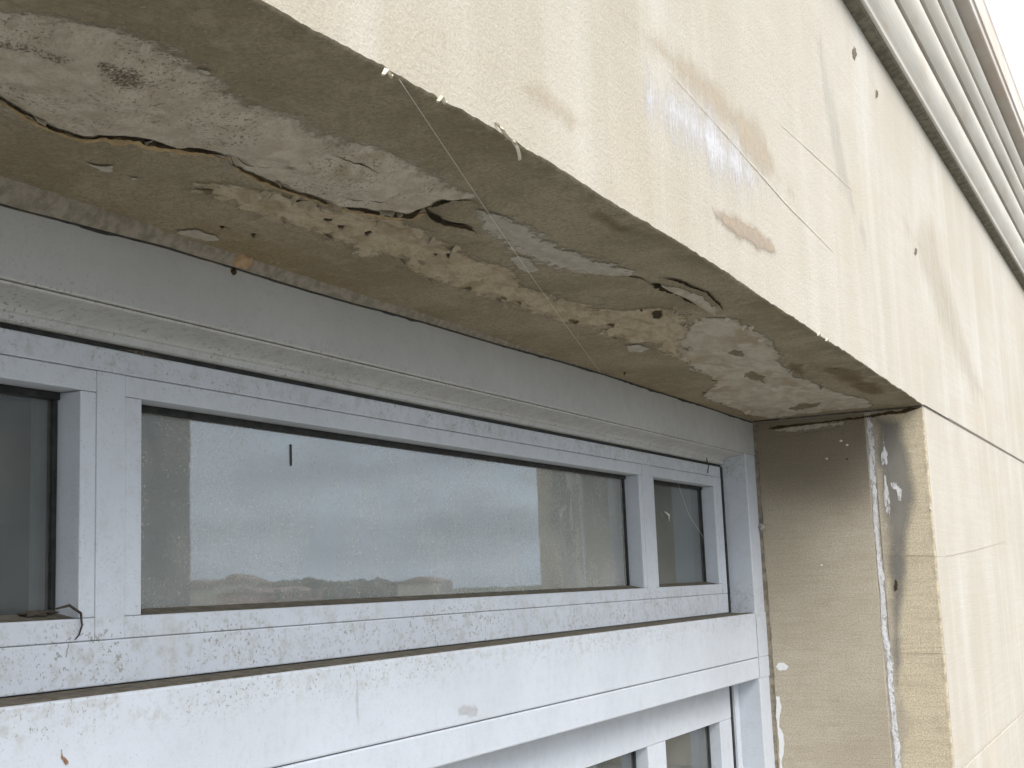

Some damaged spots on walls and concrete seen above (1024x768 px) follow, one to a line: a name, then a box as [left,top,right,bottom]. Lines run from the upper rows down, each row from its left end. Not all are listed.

crack [0,97,478,235]
spalling [0,7,872,432]
damp [866,417,912,768]